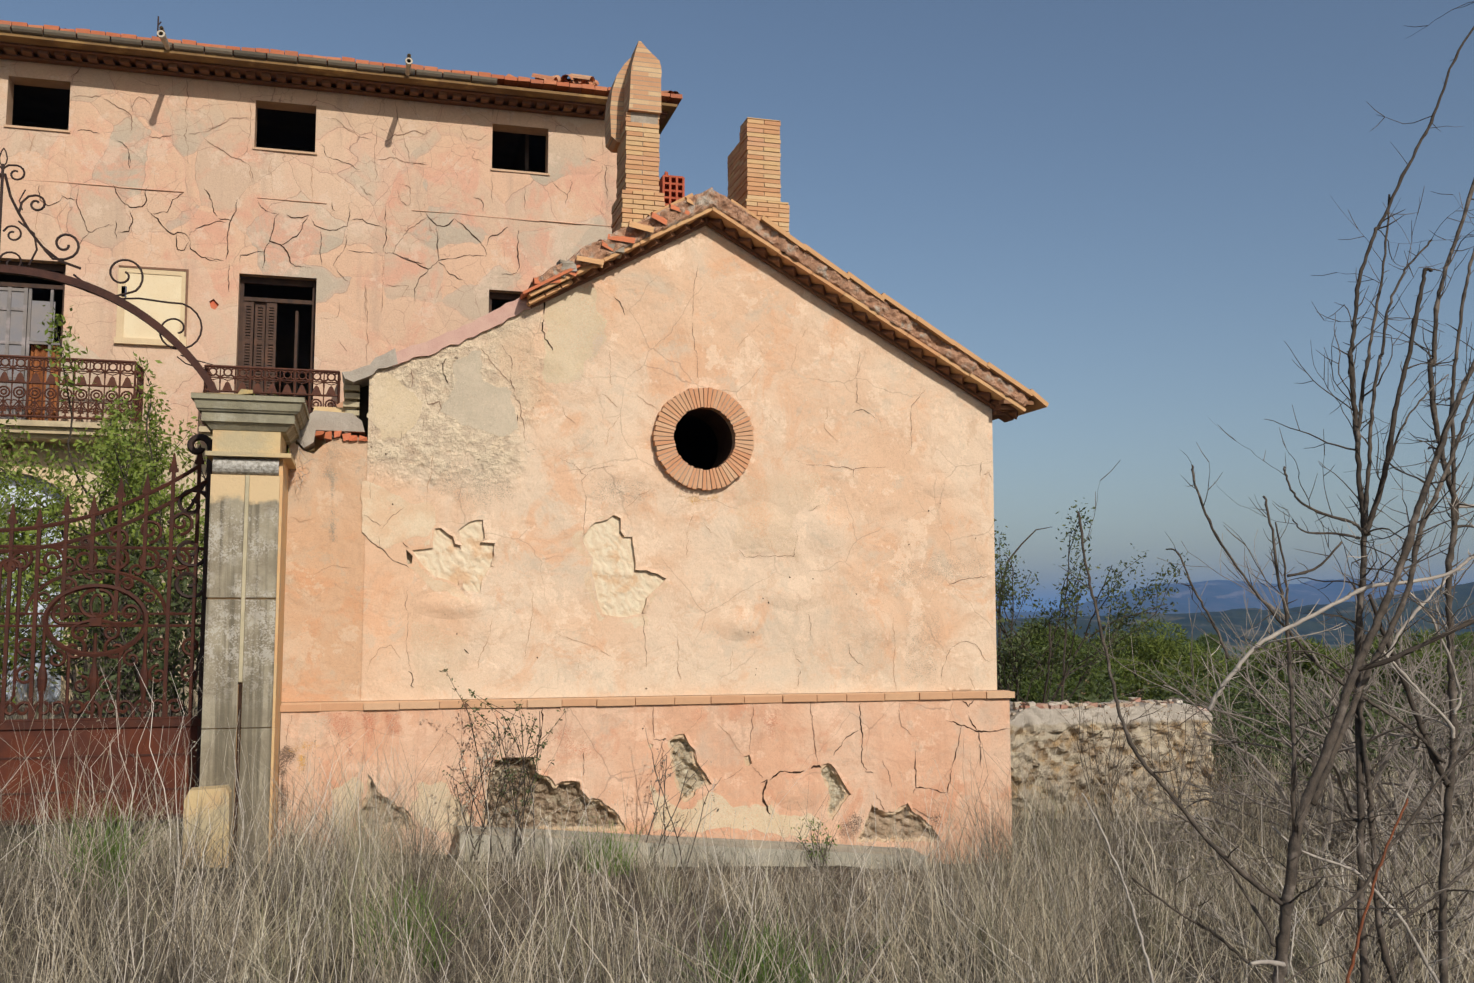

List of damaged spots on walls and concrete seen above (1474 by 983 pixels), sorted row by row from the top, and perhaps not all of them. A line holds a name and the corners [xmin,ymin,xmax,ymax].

crack [30,69,608,358]
peeling [367,373,422,442]
crack [481,348,653,529]
crack [796,358,925,473]
crack [314,360,448,686]
spalling [361,481,499,604]
spalling [572,512,668,629]
crack [653,612,1004,820]
spalling [331,753,625,836]
peeling [648,732,853,839]
spalling [857,801,939,842]